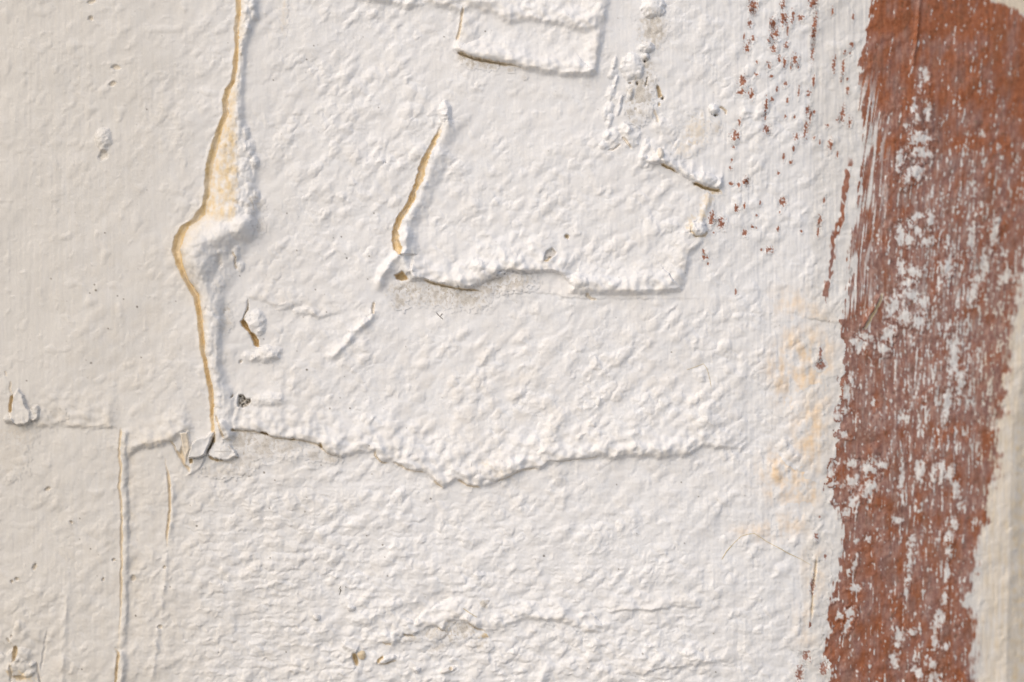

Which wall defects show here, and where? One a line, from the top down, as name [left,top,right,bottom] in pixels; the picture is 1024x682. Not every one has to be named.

peeling [893,61,939,192]
spalling [542,246,559,263]
peeling [698,247,712,267]
peeling [829,206,1018,441]
peeling [4,370,41,426]
spalling [230,392,254,411]
peeling [168,430,238,478]
crack [373,450,603,489]
crack [114,427,177,682]
peeling [811,514,828,562]
peeling [824,451,965,682]
peeling [791,533,872,682]